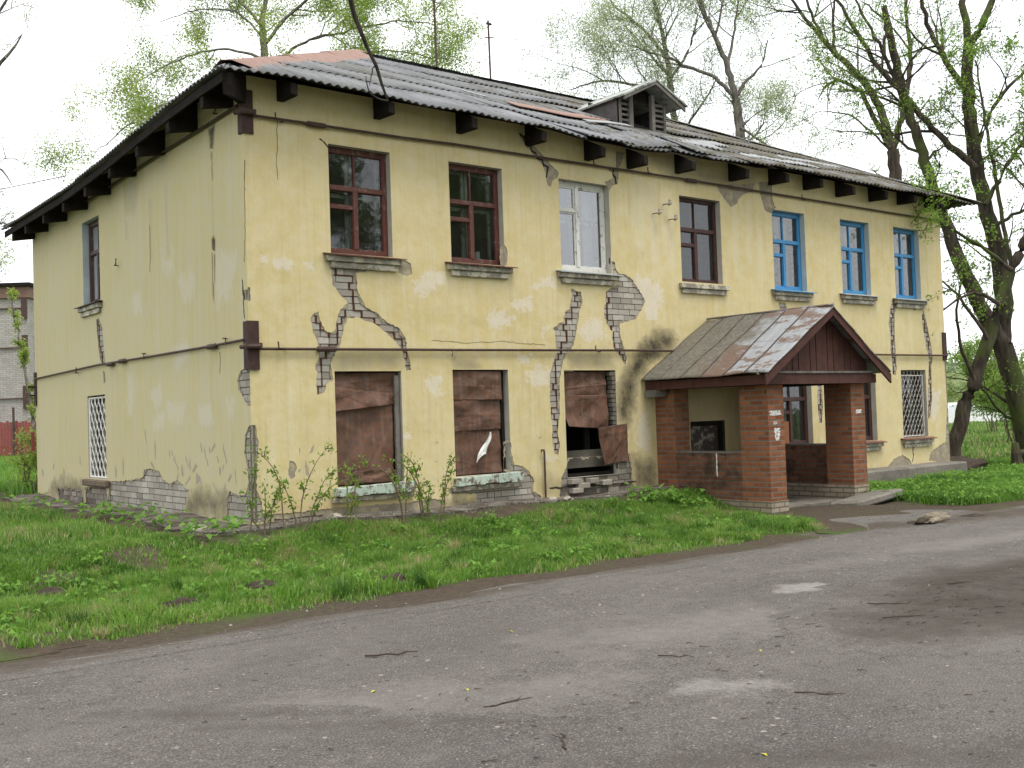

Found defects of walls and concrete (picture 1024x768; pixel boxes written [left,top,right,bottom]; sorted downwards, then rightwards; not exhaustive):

spalling [518,133,558,186]
spalling [717,182,775,213]
spalling [97,318,105,382]
peeling [170,333,193,377]
spalling [311,268,447,400]
peeling [483,258,666,497]
peeling [42,364,541,523]